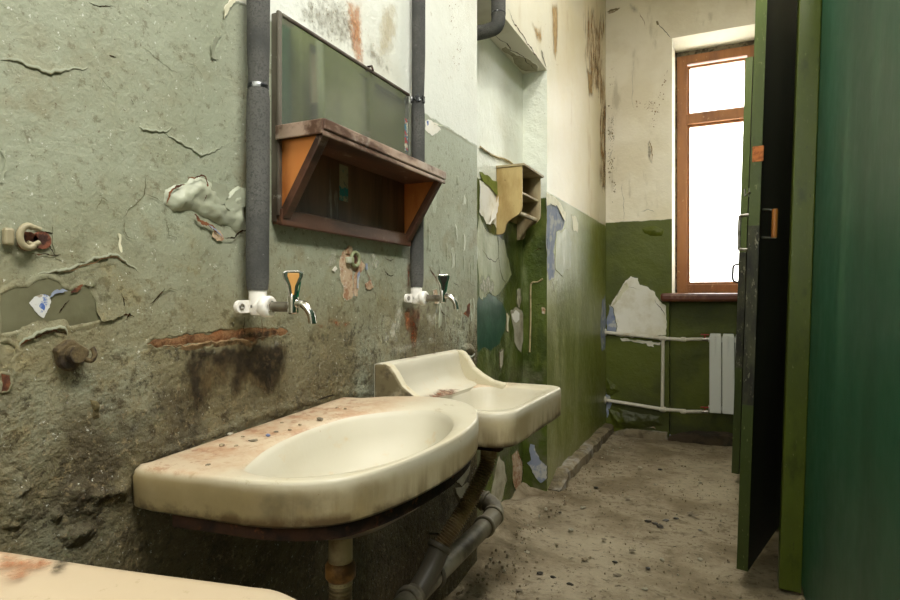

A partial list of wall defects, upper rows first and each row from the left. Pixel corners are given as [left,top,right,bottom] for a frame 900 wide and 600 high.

rust [350,4,361,59]
water stain [585,10,616,192]
peeling [0,225,140,394]
rust [144,317,290,351]
peeling [333,244,374,302]
peeling [462,172,523,369]
peeling [546,191,605,286]
peeling [600,274,669,351]
water stain [187,342,286,409]
peeling [491,443,548,502]